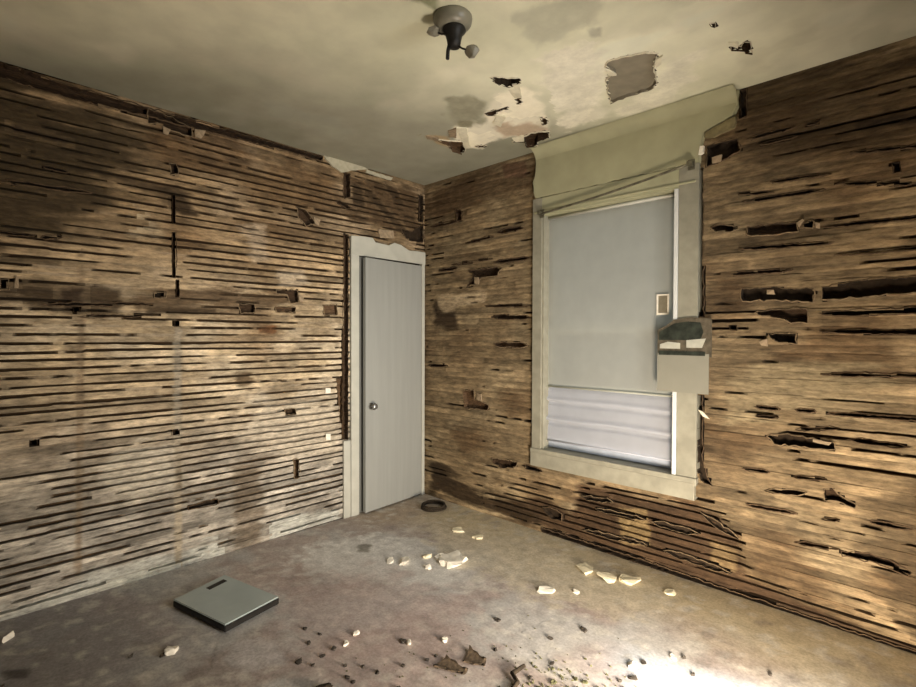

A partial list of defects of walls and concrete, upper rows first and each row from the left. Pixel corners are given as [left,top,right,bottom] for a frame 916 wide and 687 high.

water stain [425,80,512,135]
peeling [426,17,663,152]
peeling [366,169,393,181]
spalling [698,137,743,168]